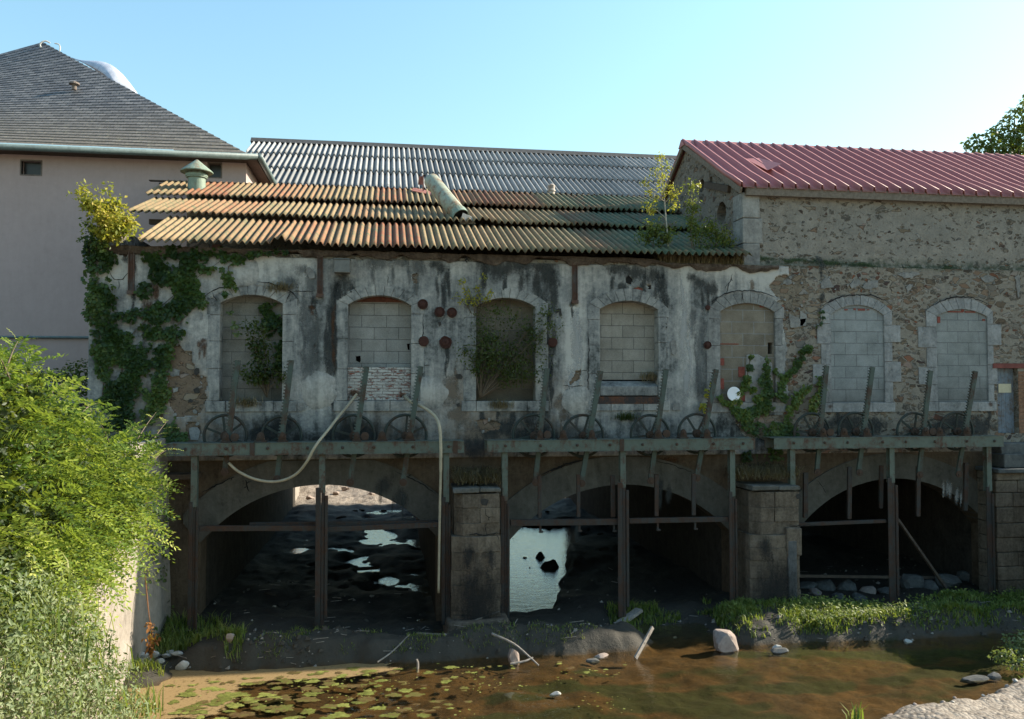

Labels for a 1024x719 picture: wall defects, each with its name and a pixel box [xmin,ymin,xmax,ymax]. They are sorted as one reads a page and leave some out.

water stain [285,266,356,376]
water stain [608,265,669,319]
water stain [688,275,718,392]
spalling [165,343,208,436]